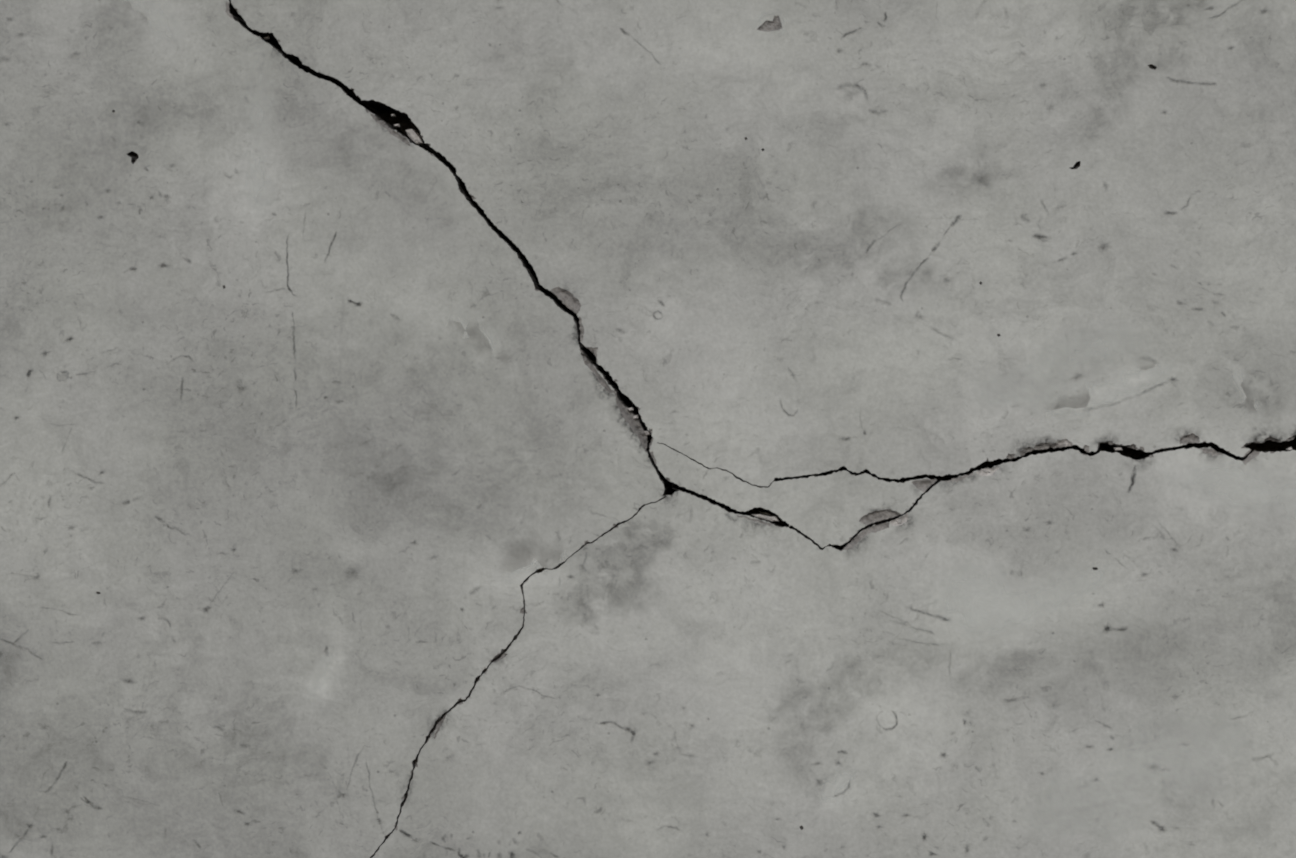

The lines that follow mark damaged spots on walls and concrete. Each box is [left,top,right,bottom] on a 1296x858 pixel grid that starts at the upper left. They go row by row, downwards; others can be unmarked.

crack [225,0,652,436]
crack [370,395,1296,858]